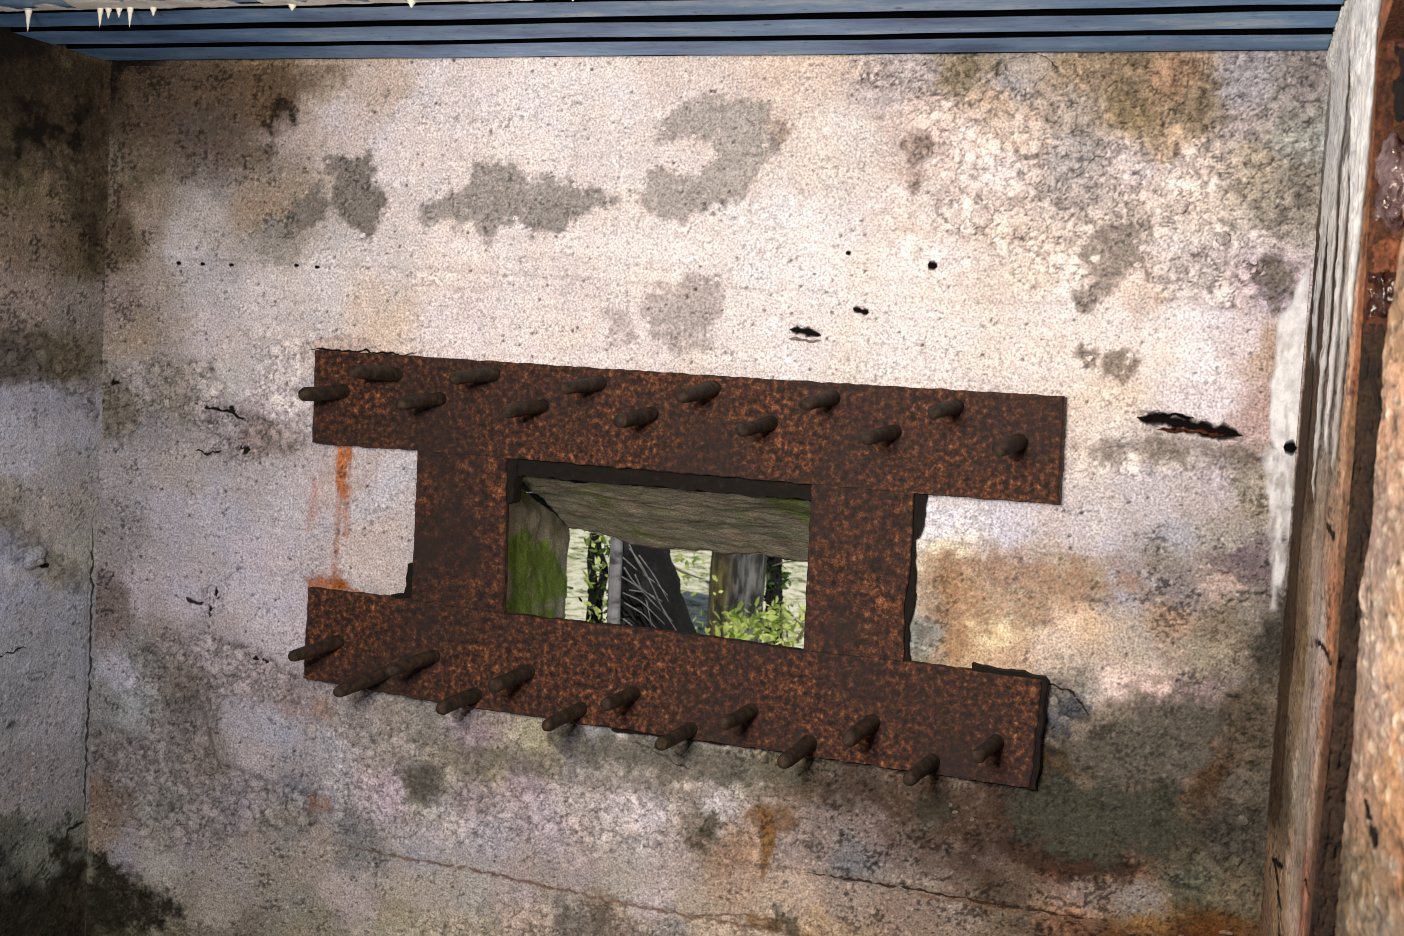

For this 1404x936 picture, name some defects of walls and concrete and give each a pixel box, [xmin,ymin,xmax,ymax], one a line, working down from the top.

leakage [0,0,531,31]
leakage [262,98,298,134]
leakage [1266,0,1380,590]
rust [336,446,352,497]
rust [1305,0,1404,936]
rust [307,577,357,592]
rust [918,554,1139,659]
rust [760,810,774,877]
crack [1272,856,1309,936]